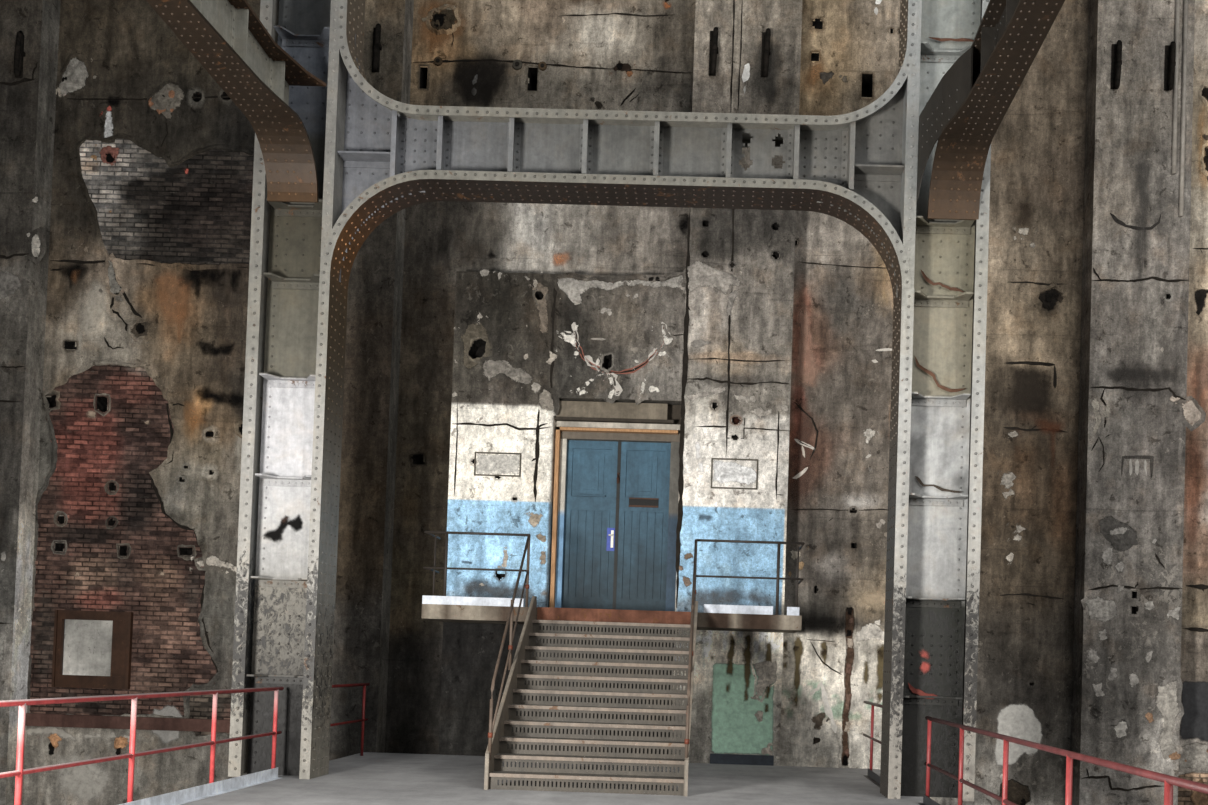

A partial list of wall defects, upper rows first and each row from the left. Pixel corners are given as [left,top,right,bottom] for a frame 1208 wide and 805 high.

spalling [56,53,97,103]
leakage [455,61,506,104]
flaking render [75,105,254,302]
crack [104,272,142,349]
spalling [454,312,711,416]
spalling [475,256,747,365]
flaking render [27,339,237,741]
spalling [1081,511,1208,805]